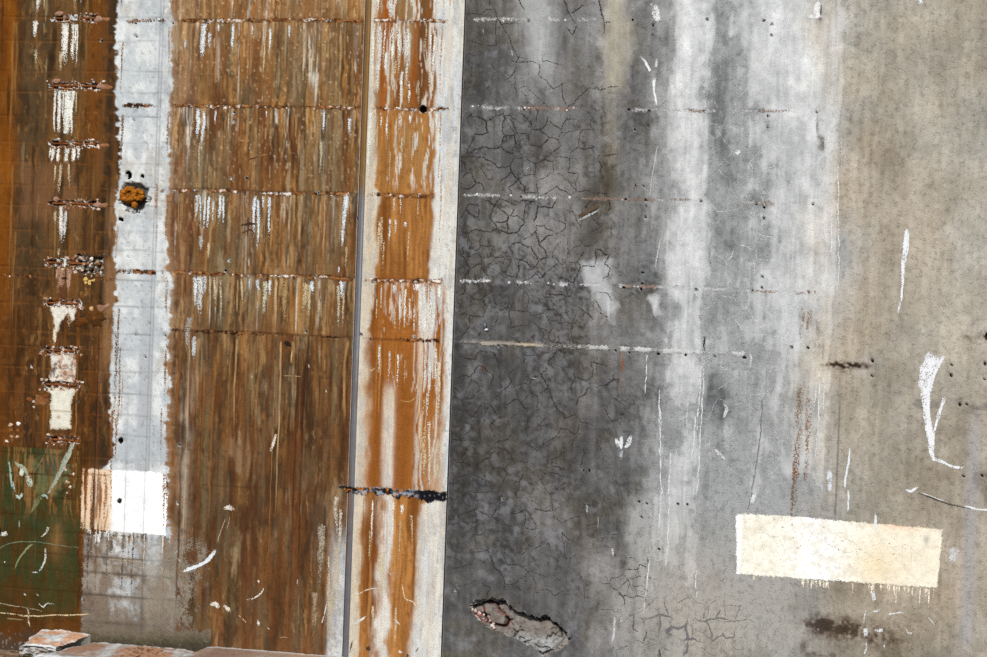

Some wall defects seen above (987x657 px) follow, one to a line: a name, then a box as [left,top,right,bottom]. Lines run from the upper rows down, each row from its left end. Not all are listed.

efflorescence [59,22,79,68]
efflorescence [53,90,77,135]
efflorescence [49,147,80,192]
leakage [376,198,410,273]
efflorescence [44,207,77,430]
rust [0,0,140,651]
rust [155,0,464,657]
leakage [376,283,442,336]
crack [101,0,747,657]
leakage [418,0,851,657]
leakage [378,346,406,414]
spalling [470,597,578,656]